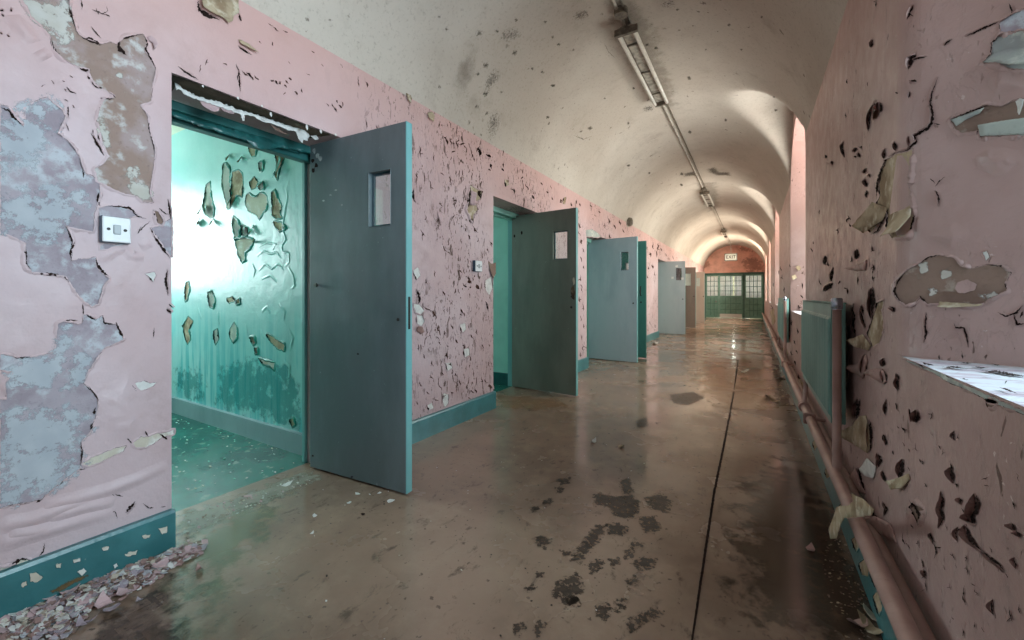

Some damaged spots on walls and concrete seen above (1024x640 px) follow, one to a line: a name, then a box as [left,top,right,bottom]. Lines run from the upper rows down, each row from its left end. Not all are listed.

peeling [978,4,1024,74]
peeling [946,95,1024,142]
peeling [172,100,322,264]
peeling [852,147,918,241]
peeling [0,0,176,509]
peeling [182,280,194,345]
peeling [207,289,241,310]
peeling [213,321,286,372]
crack [771,19,1024,635]
peeling [844,250,1014,378]
peeling [900,356,1024,416]
spalling [112,525,168,569]